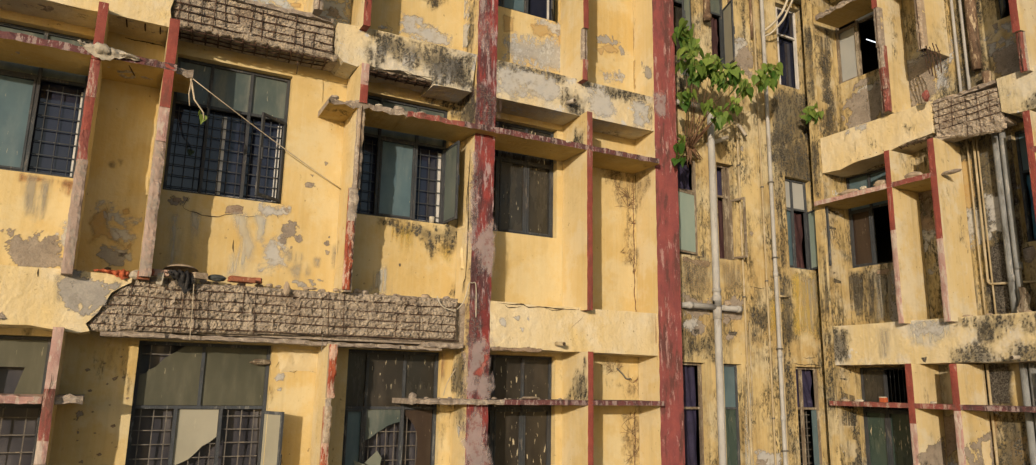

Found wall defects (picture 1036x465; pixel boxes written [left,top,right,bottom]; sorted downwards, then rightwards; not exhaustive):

spalling [173,0,350,74]
spalling [369,53,460,88]
damp [368,1,496,123]
peeling [400,0,561,101]
peeling [581,28,652,117]
peeling [632,93,679,127]
flaking render [841,7,892,135]
spalling [898,0,1028,149]
spalling [1,106,542,465]
damp [682,328,715,362]
damp [749,5,894,465]
damp [951,133,1036,465]